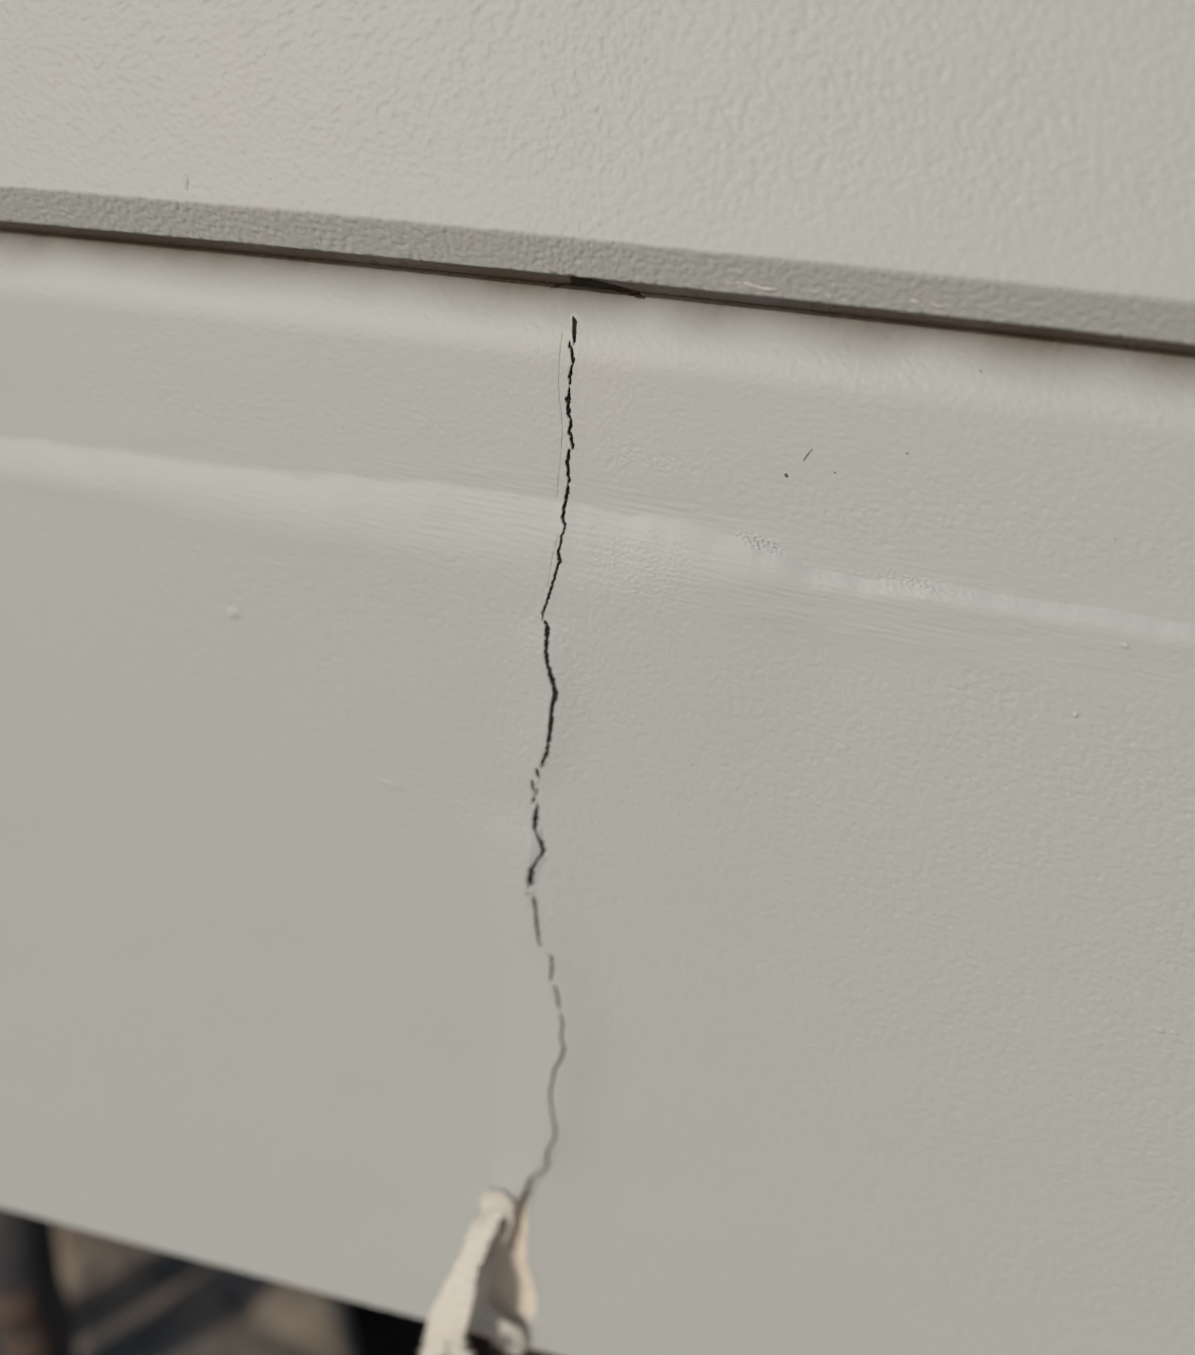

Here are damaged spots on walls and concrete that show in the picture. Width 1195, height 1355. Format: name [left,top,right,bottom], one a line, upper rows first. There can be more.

crack [520,317,577,1203]
flaking render [417,1188,540,1355]